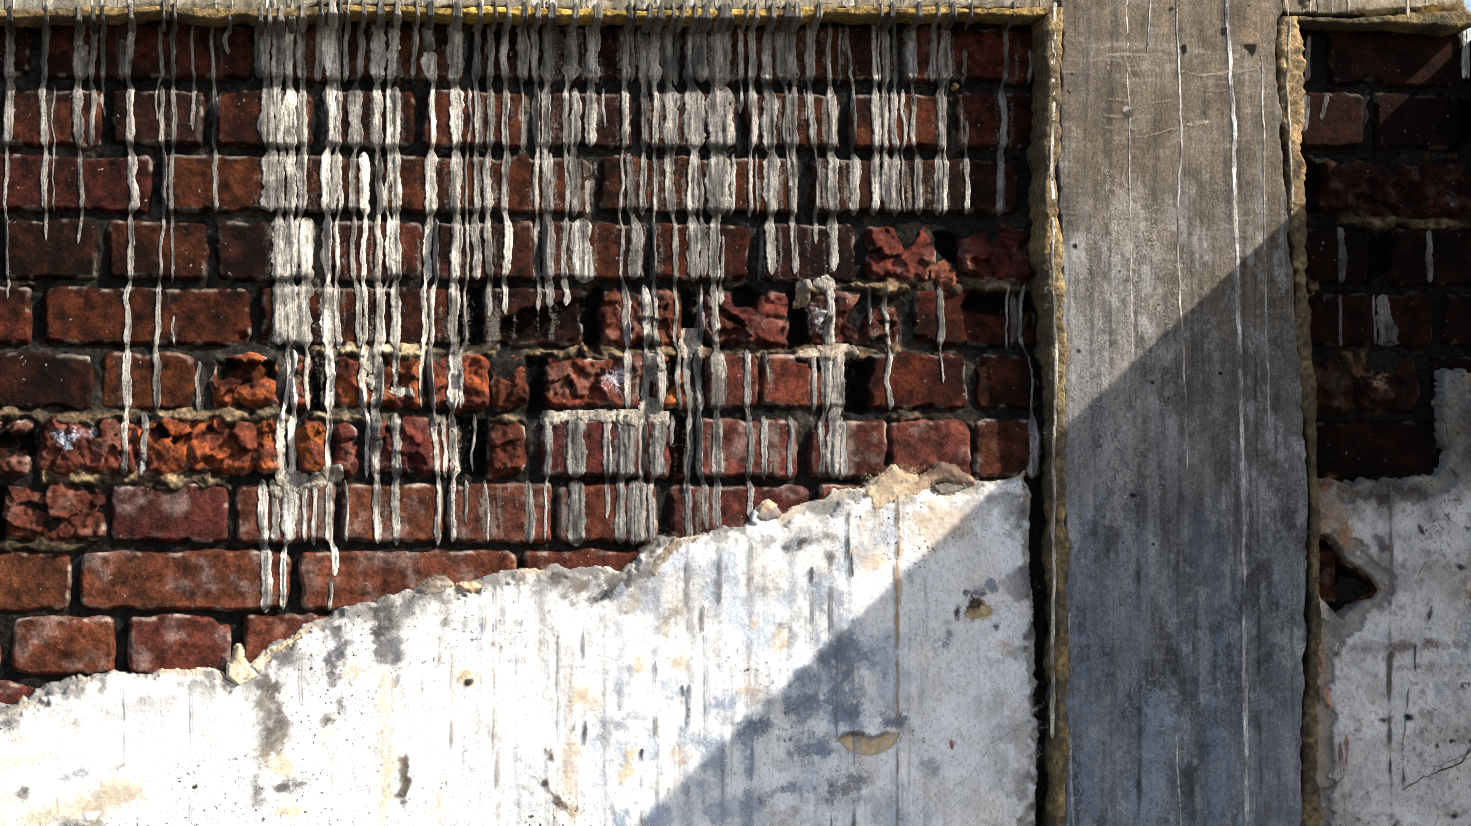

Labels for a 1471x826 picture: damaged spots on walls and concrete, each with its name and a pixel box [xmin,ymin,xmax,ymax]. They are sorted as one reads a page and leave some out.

leakage [1,0,233,476]
leakage [253,0,985,826]
flaking render [757,500,782,521]
flaking render [864,462,977,509]
flaking render [652,536,679,576]
flaking render [418,576,483,594]
flaking render [942,578,999,650]
spalling [1325,562,1370,615]
flaking render [226,629,306,685]
leakage [0,751,144,826]
peeling [839,731,898,755]
crack [1401,748,1471,790]